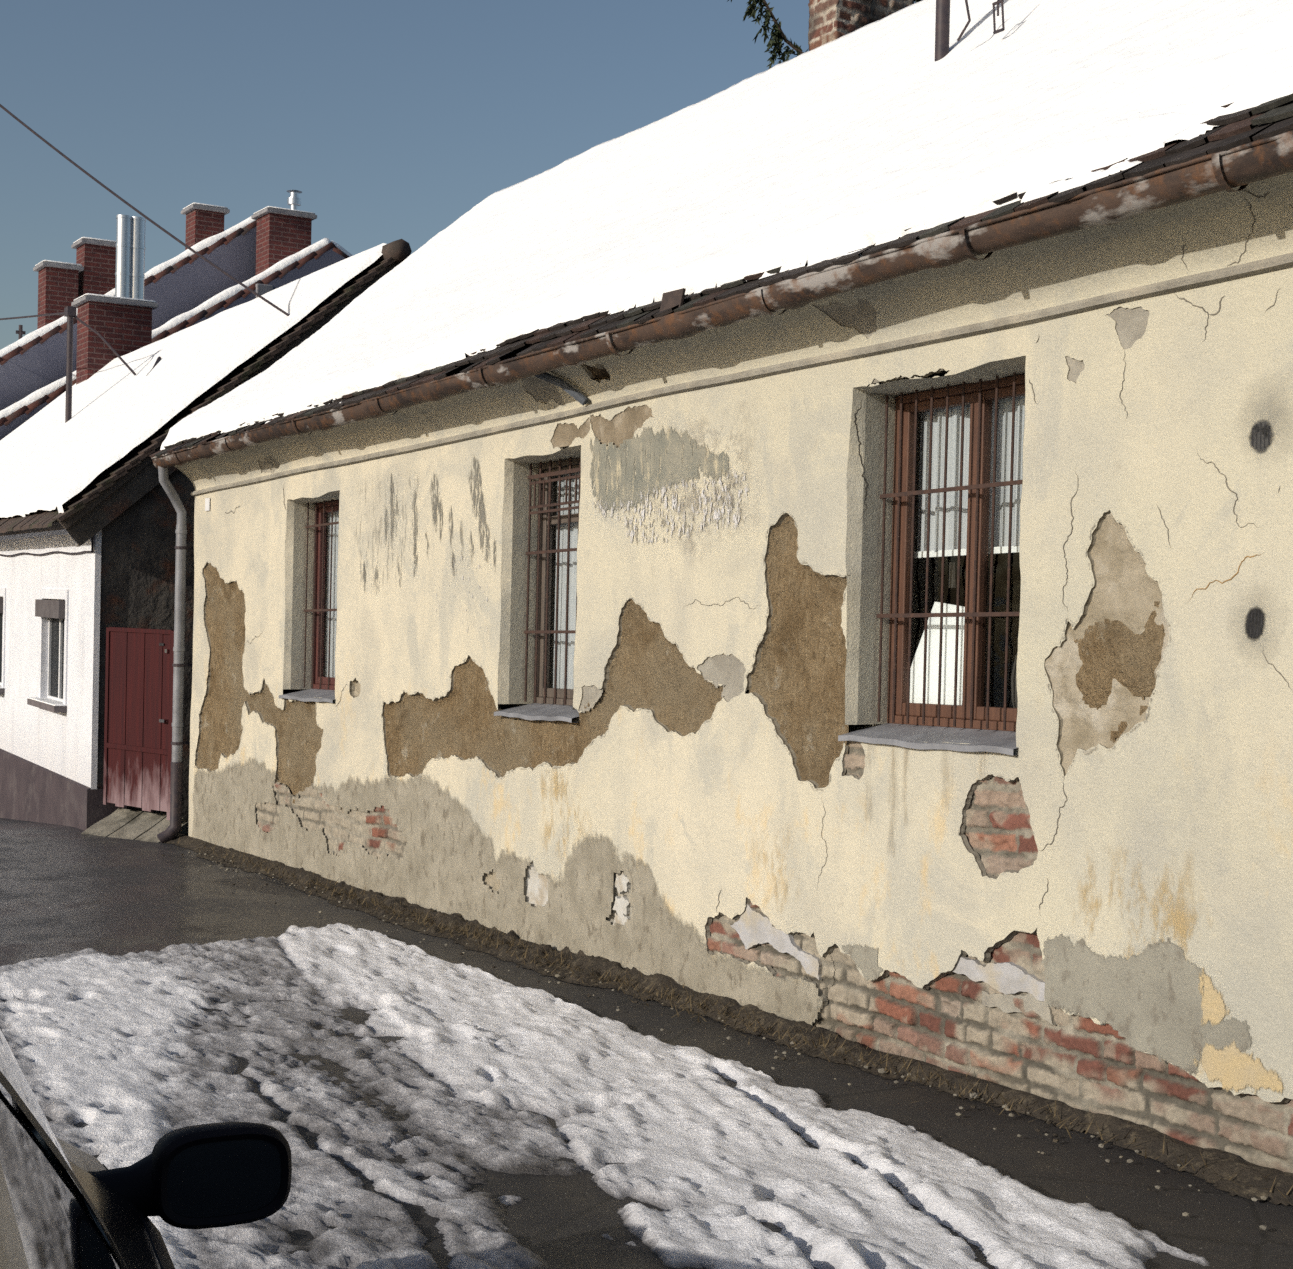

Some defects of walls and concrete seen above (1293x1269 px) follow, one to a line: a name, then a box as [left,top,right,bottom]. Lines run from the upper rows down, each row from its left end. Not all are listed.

flaking render [521,376,566,406]
leakage [359,459,496,611]
peeling [550,405,749,544]
peeling [192,510,1293,1173]